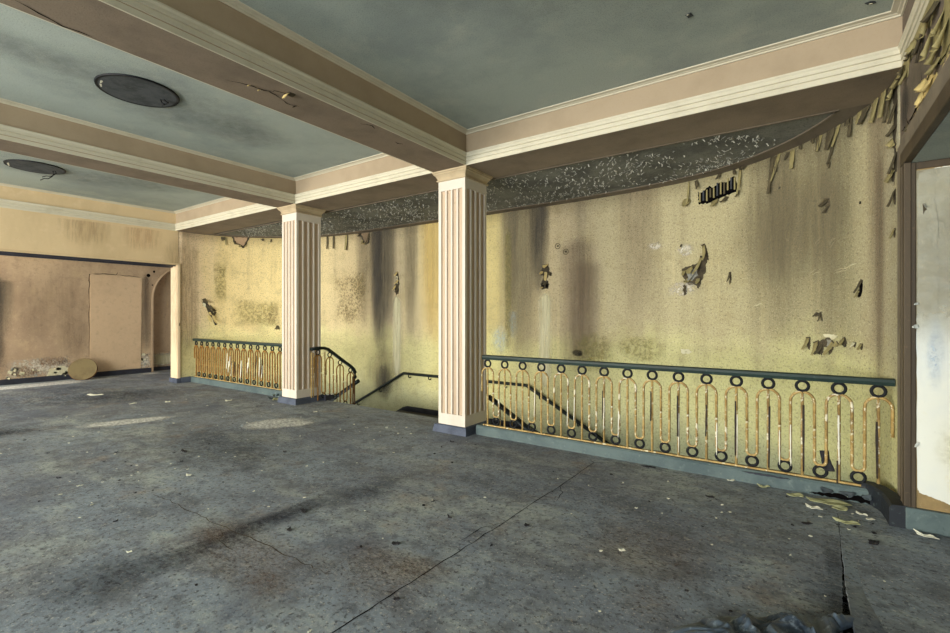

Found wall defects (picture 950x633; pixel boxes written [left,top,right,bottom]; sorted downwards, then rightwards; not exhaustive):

peeling [486,0,950,214]
spalling [6,357,68,380]
peeling [202,298,217,325]
leakage [373,230,400,391]
leakage [532,206,546,272]
leakage [540,294,550,384]
peeling [539,264,552,290]
peeling [680,243,709,295]
peeling [801,334,863,355]
peeling [853,279,863,298]
crack [332,462,615,633]
crack [838,513,886,633]